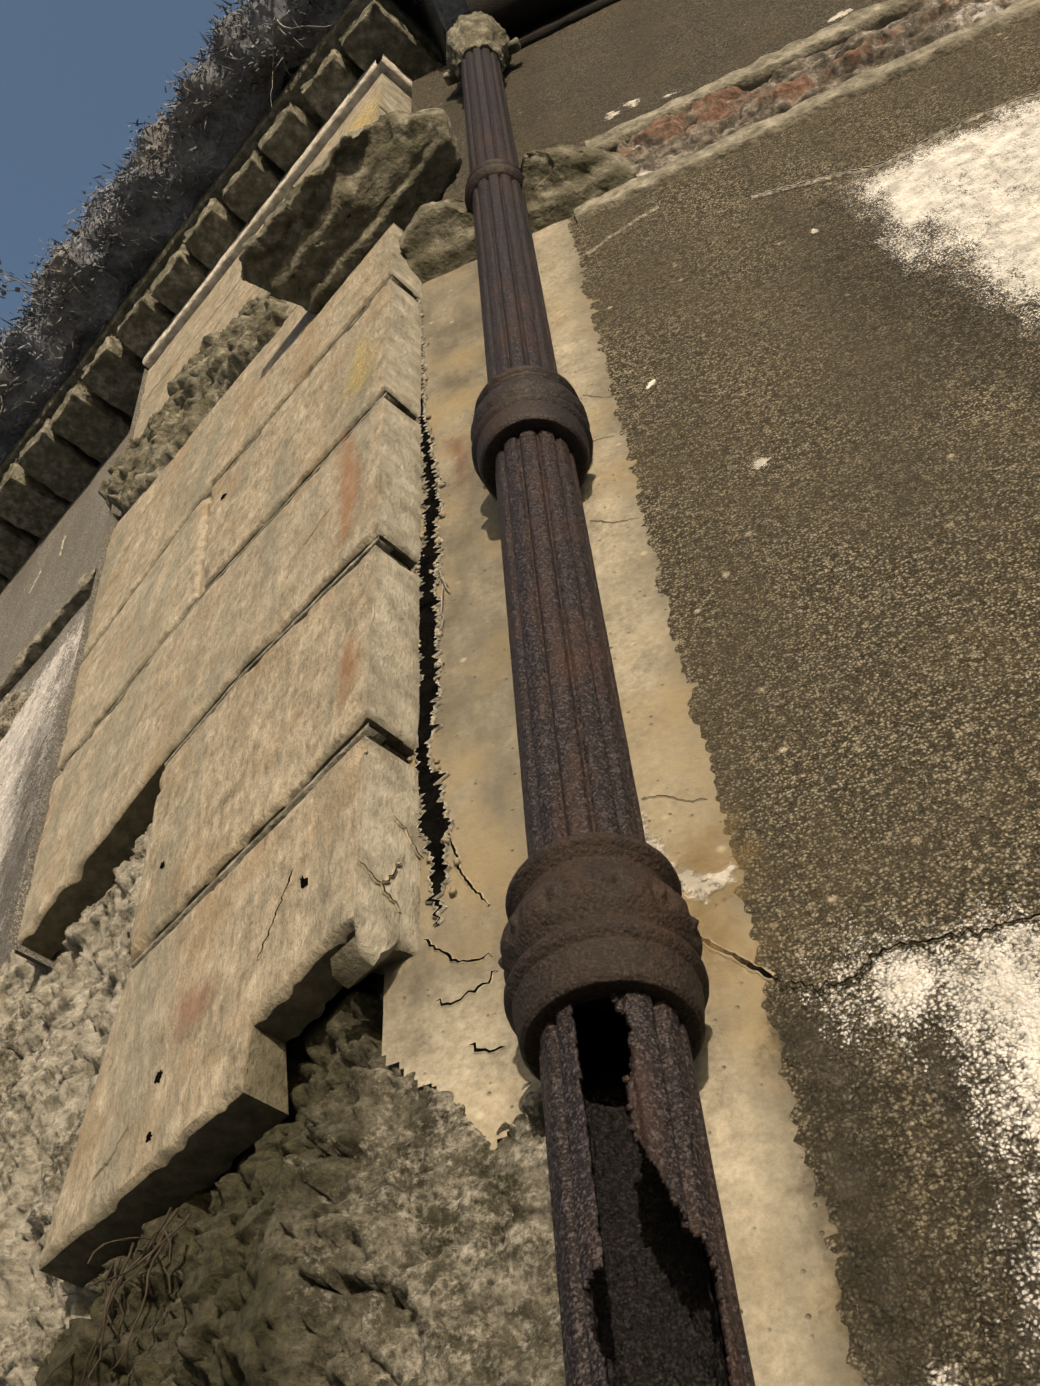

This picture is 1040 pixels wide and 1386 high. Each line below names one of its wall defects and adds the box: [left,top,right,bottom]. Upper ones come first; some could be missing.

peeling [605,98,640,120]
spalling [616,0,1019,177]
leakage [840,95,1040,336]
peeling [0,689,34,741]
leakage [0,599,89,968]
crack [356,290,498,1007]
peeling [641,812,736,906]
crack [700,912,1040,997]
spalling [0,823,566,1386]
crack [469,1042,506,1054]
leakage [773,900,1040,1386]